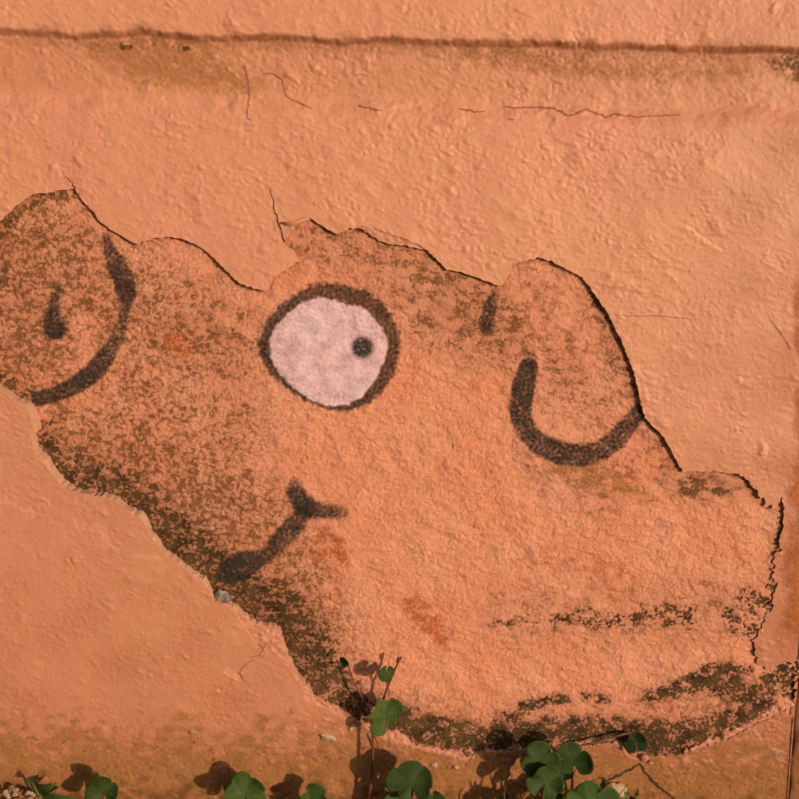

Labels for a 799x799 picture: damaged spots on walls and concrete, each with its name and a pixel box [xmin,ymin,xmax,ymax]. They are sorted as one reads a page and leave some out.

leakage [772,56,799,81]
crack [505,106,681,120]
peeling [0,188,799,770]